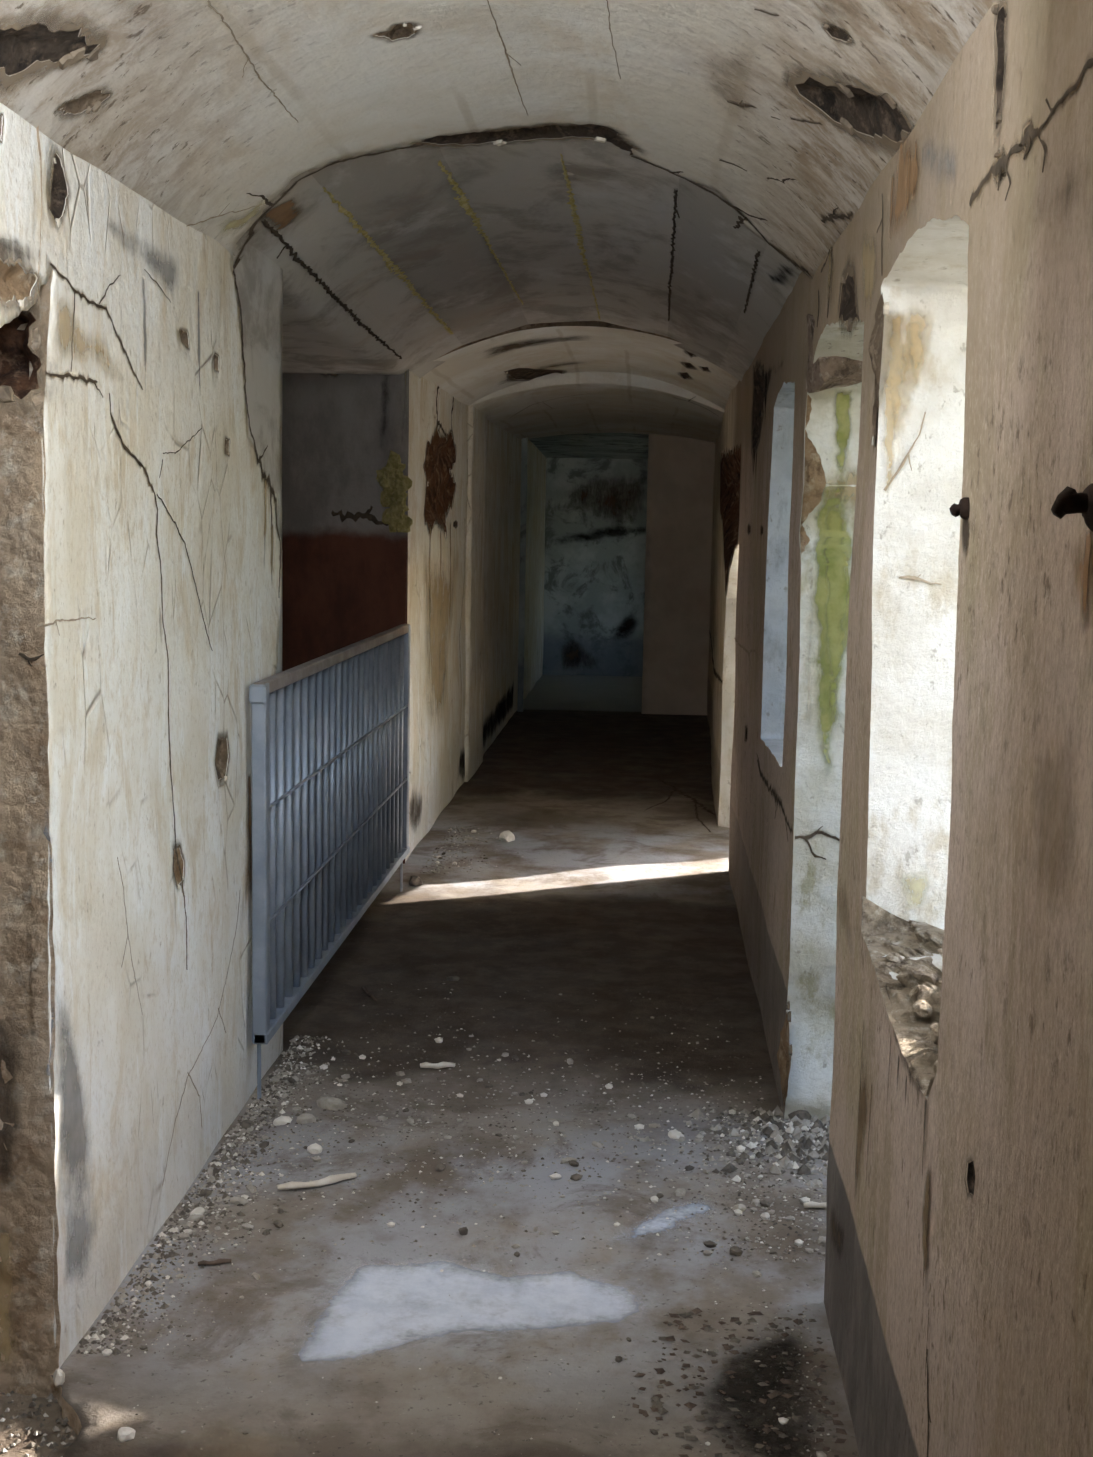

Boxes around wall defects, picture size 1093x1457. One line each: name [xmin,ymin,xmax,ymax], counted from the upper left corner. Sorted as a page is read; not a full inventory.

spalling [0,14,107,90]
spalling [786,69,915,153]
spalling [991,0,1033,184]
crack [969,58,1093,207]
crack [186,203,402,359]
peeling [0,385,15,403]
spalling [423,425,456,537]
water stain [835,392,851,472]
crack [18,617,96,667]
crack [45,263,213,970]
water stain [824,509,849,707]
crack [757,755,840,860]